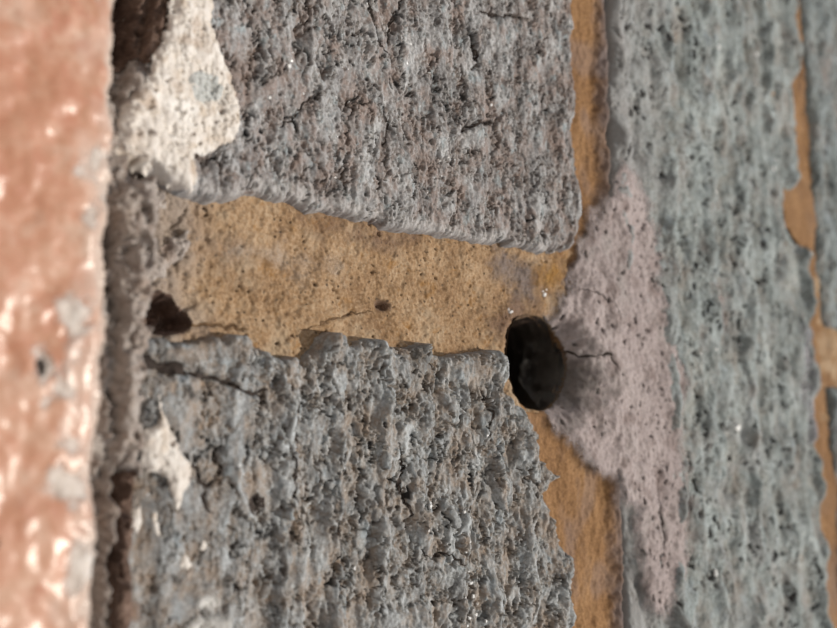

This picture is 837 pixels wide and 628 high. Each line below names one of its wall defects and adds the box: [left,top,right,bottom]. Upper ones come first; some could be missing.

spalling [129,179,167,236]
spalling [120,230,193,336]
crack [533,351,620,370]
spalling [126,381,145,455]